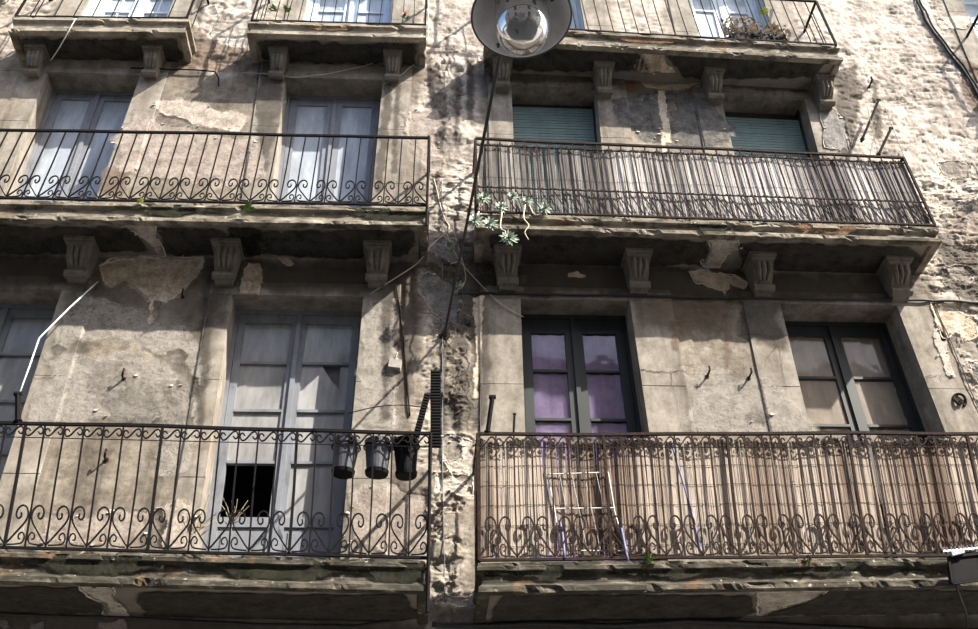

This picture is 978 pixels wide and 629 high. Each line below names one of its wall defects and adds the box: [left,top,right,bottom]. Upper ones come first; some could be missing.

water stain [22,0,417,170]
water stain [377,83,401,191]
water stain [428,60,474,194]
flaking render [99,225,205,324]
flaking render [689,240,748,295]
peeling [930,304,978,377]
peeling [968,361,978,384]
flaking render [430,592,474,608]